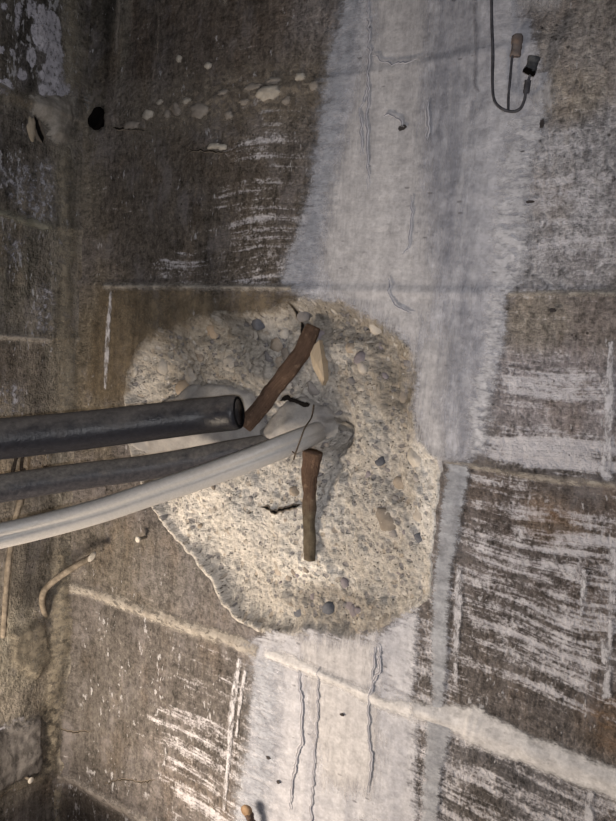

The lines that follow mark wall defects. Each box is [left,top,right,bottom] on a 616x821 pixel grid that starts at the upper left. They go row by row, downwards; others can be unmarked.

corrosion [243,323,320,432]
corrosion [301,448,323,562]
crack [366,644,381,793]